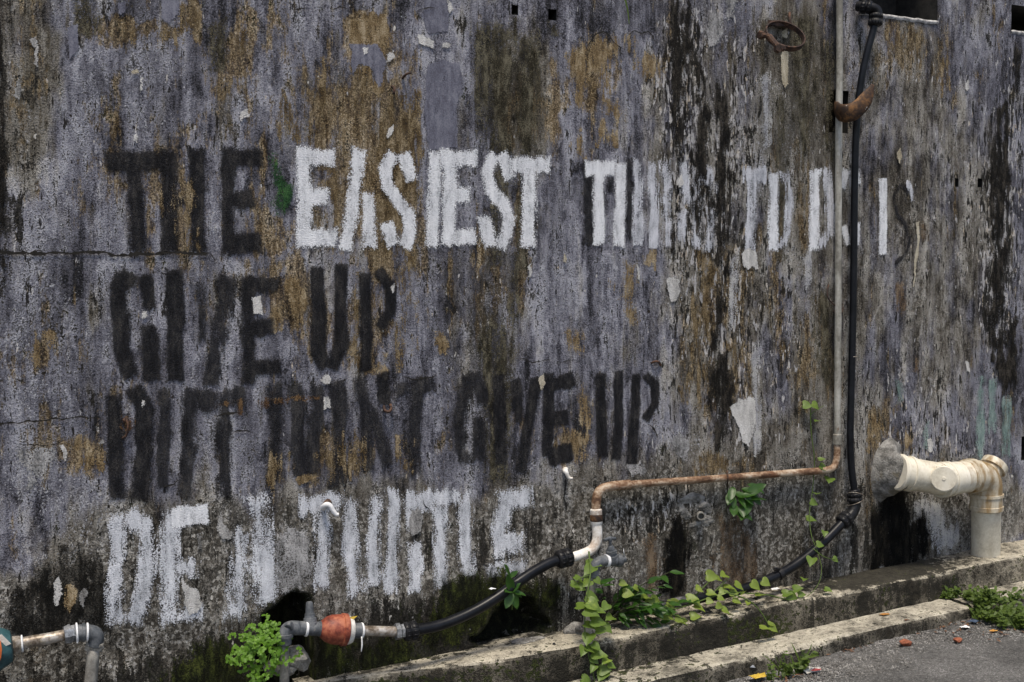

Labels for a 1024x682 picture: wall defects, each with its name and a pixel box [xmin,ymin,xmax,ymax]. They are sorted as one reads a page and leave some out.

crack [0,250,217,260]
leakage [668,0,741,451]
leakage [973,42,1024,459]
peeling [666,246,758,447]
efflorescence [750,341,762,457]
leakage [867,491,961,570]
mould [3,544,116,648]